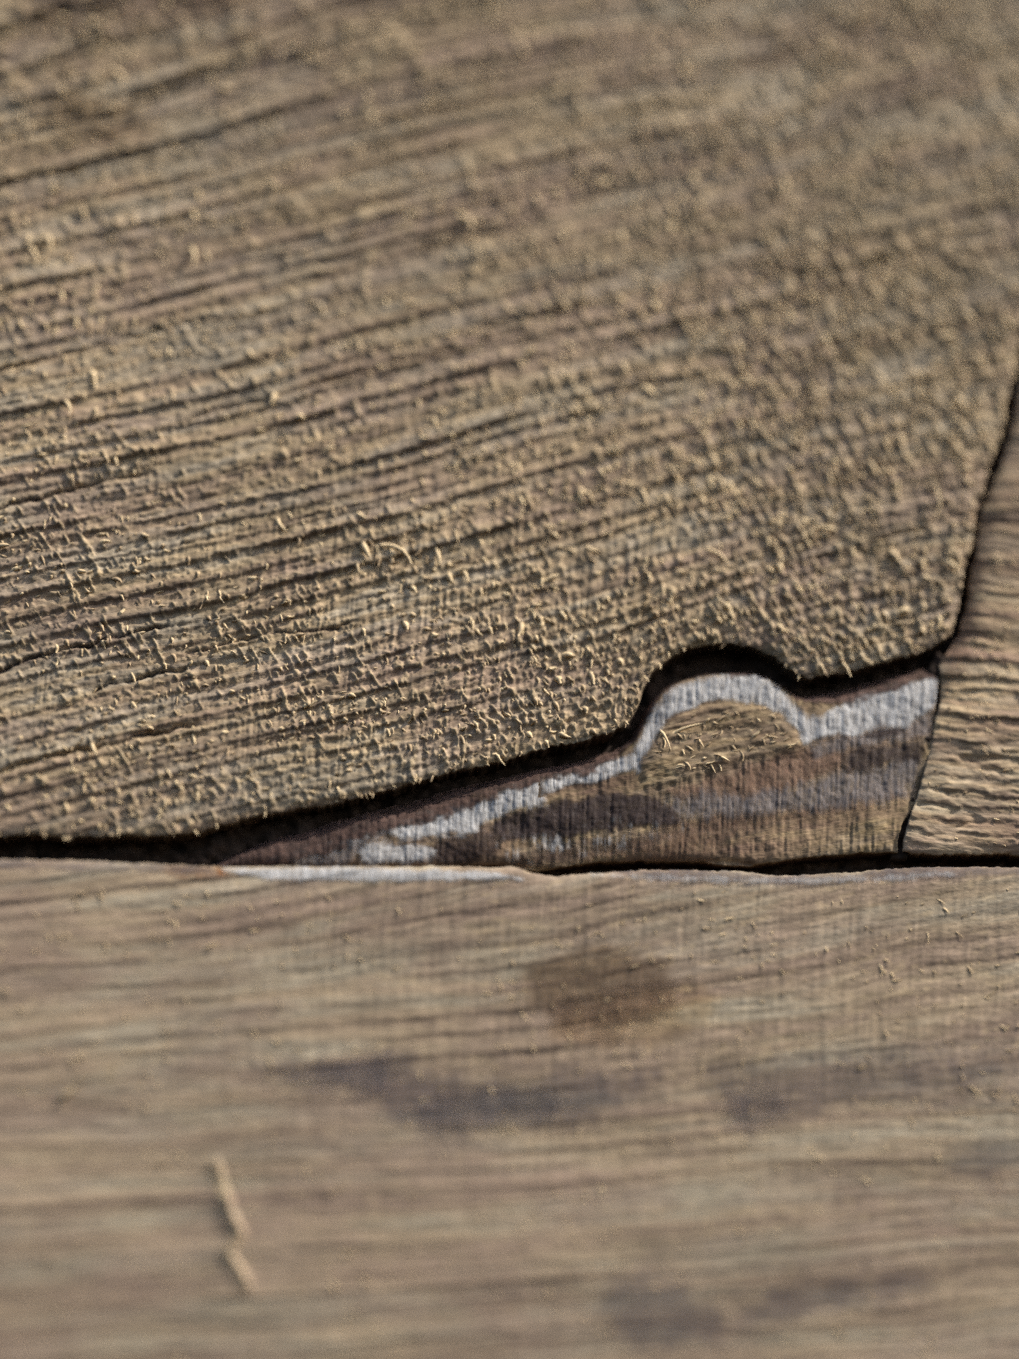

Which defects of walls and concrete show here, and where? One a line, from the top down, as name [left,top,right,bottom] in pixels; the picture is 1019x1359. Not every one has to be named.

crack [3,138,213,187]
crack [0,316,221,372]
crack [182,331,528,421]
crack [0,353,1019,877]
peeling [226,675,938,881]